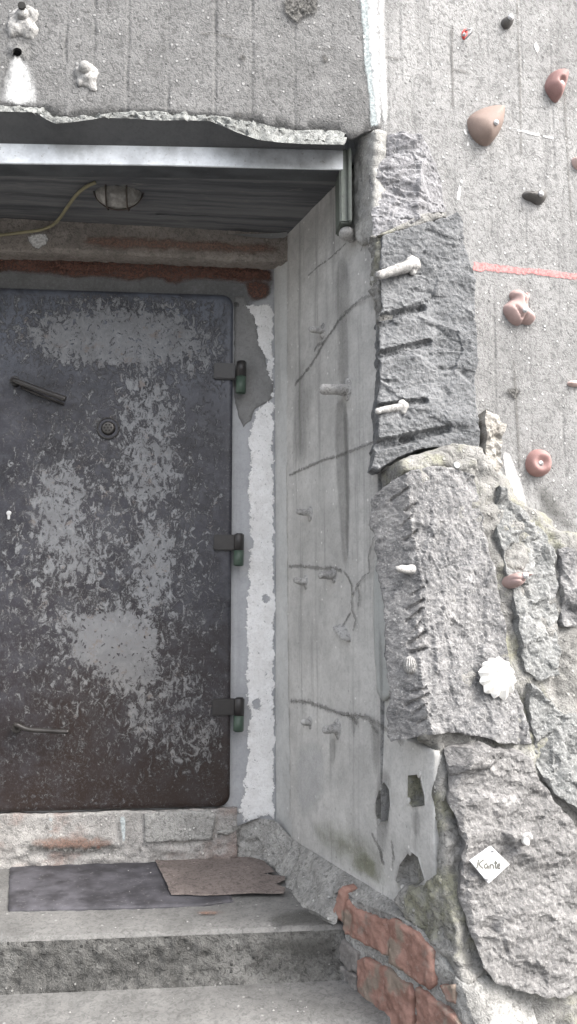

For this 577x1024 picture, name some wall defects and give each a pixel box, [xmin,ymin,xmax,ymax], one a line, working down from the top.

spalling [0,105,347,145]
peeling [239,304,276,822]
spalling [376,782,390,826]
spalling [406,771,425,807]
spalling [396,848,424,889]